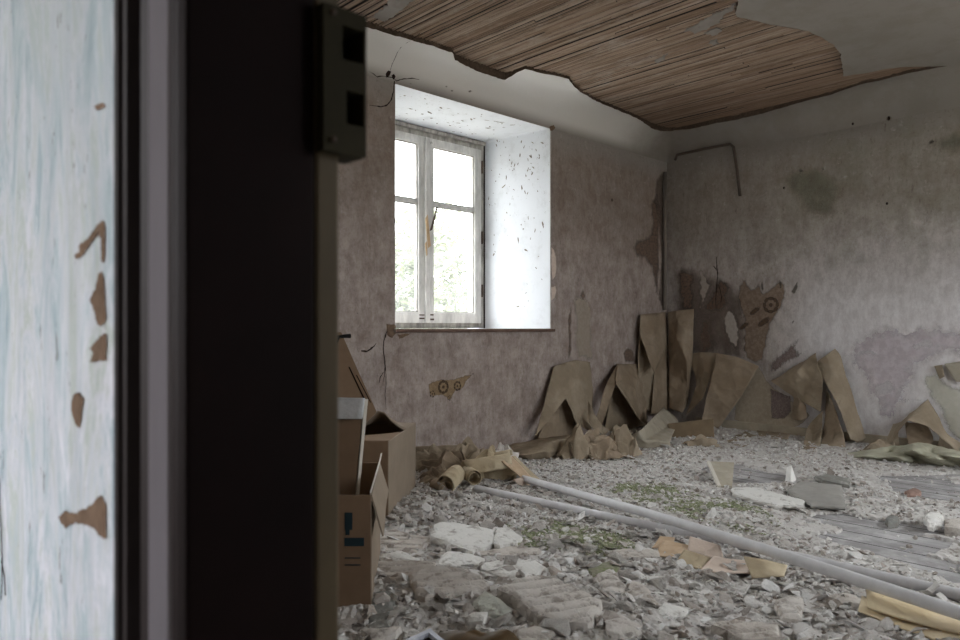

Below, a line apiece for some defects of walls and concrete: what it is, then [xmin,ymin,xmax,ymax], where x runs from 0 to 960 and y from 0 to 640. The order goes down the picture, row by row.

spalling [338,3,943,131]
peeling [635,201,659,286]
peeling [74,221,107,363]
peeling [679,271,797,362]
peeling [71,392,84,428]
peeling [429,375,471,400]
peeling [58,495,106,539]